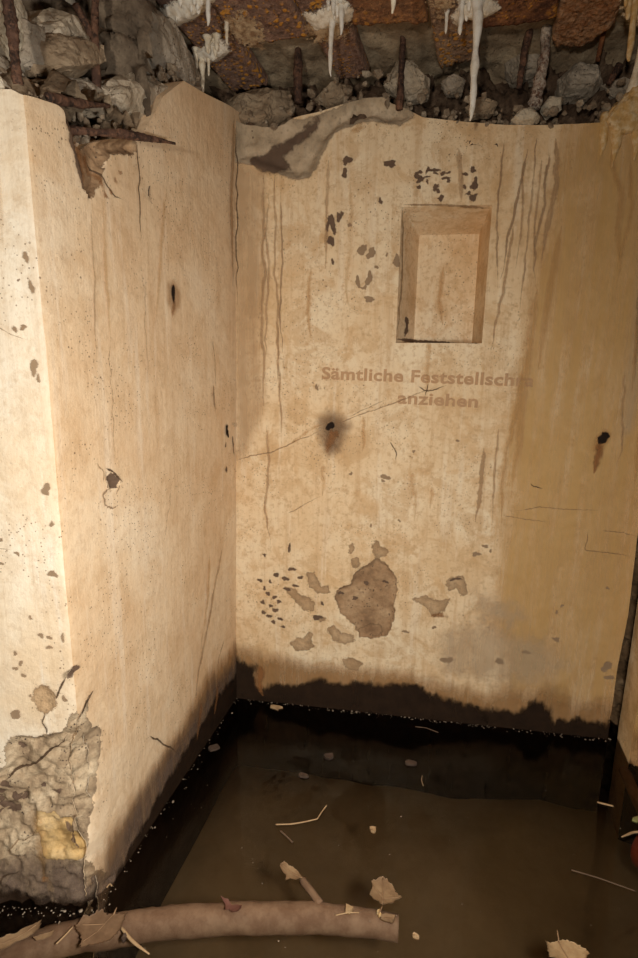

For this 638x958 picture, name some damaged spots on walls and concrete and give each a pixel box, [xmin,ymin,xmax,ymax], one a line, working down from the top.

spalling [1,0,24,86]
spalling [72,0,99,49]
spalling [44,92,176,199]
leakage [160,0,274,92]
spalling [236,35,414,180]
leakage [298,0,354,76]
spalling [414,166,478,202]
leakage [425,0,501,121]
leakage [497,49,638,704]
spalling [0,665,109,916]
leakage [0,649,612,938]
leakage [618,759,638,844]